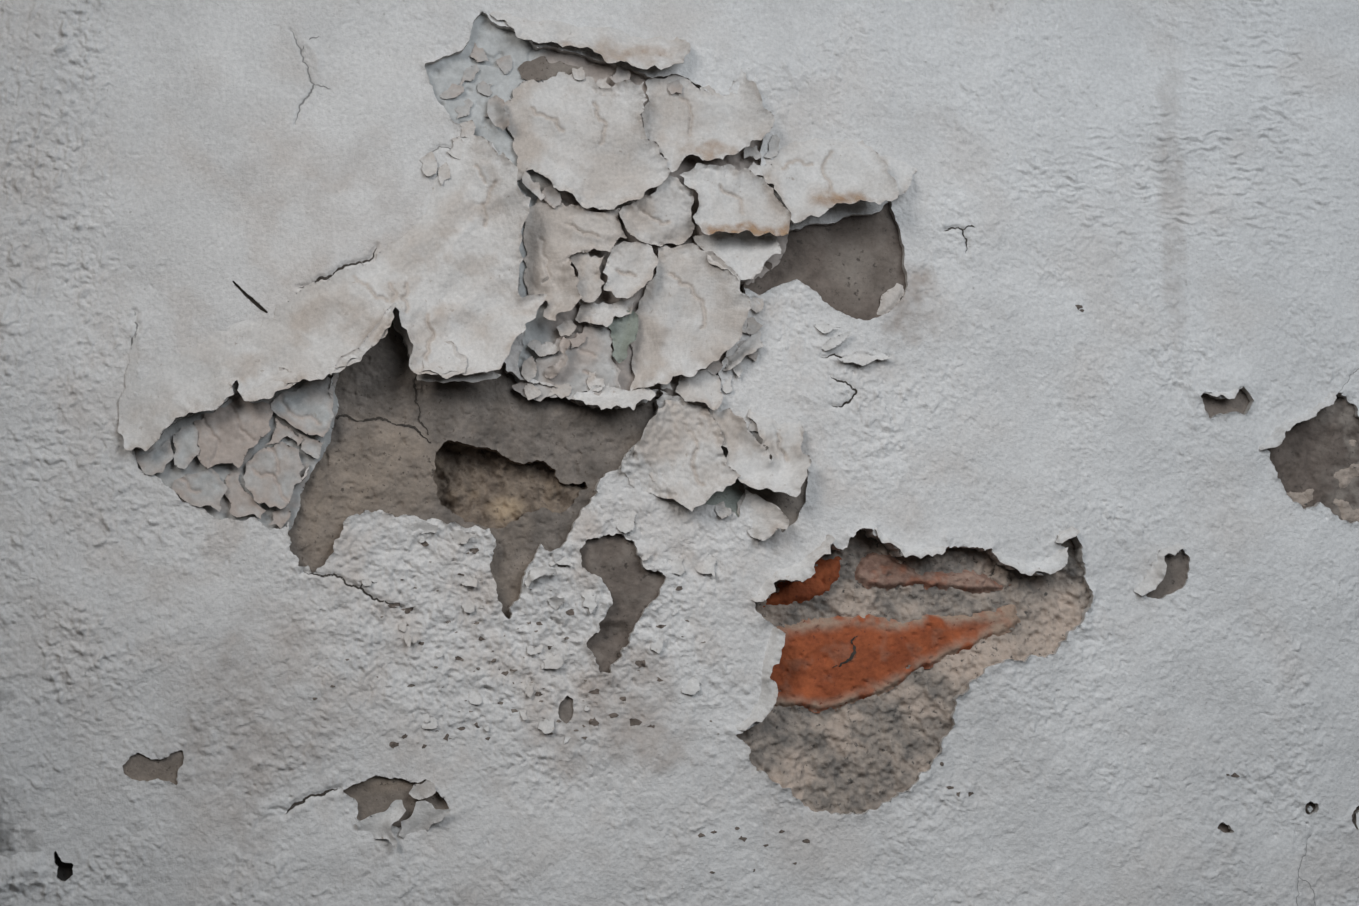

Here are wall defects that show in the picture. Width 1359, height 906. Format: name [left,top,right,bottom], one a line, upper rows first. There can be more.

crack [290,30,330,122]
peeling [118,10,917,749]
peeling [1201,386,1250,418]
spalling [1259,392,1359,523]
peeling [1133,543,1189,599]
spalling [735,526,1091,814]
peeling [123,750,184,785]
peeling [343,776,451,849]